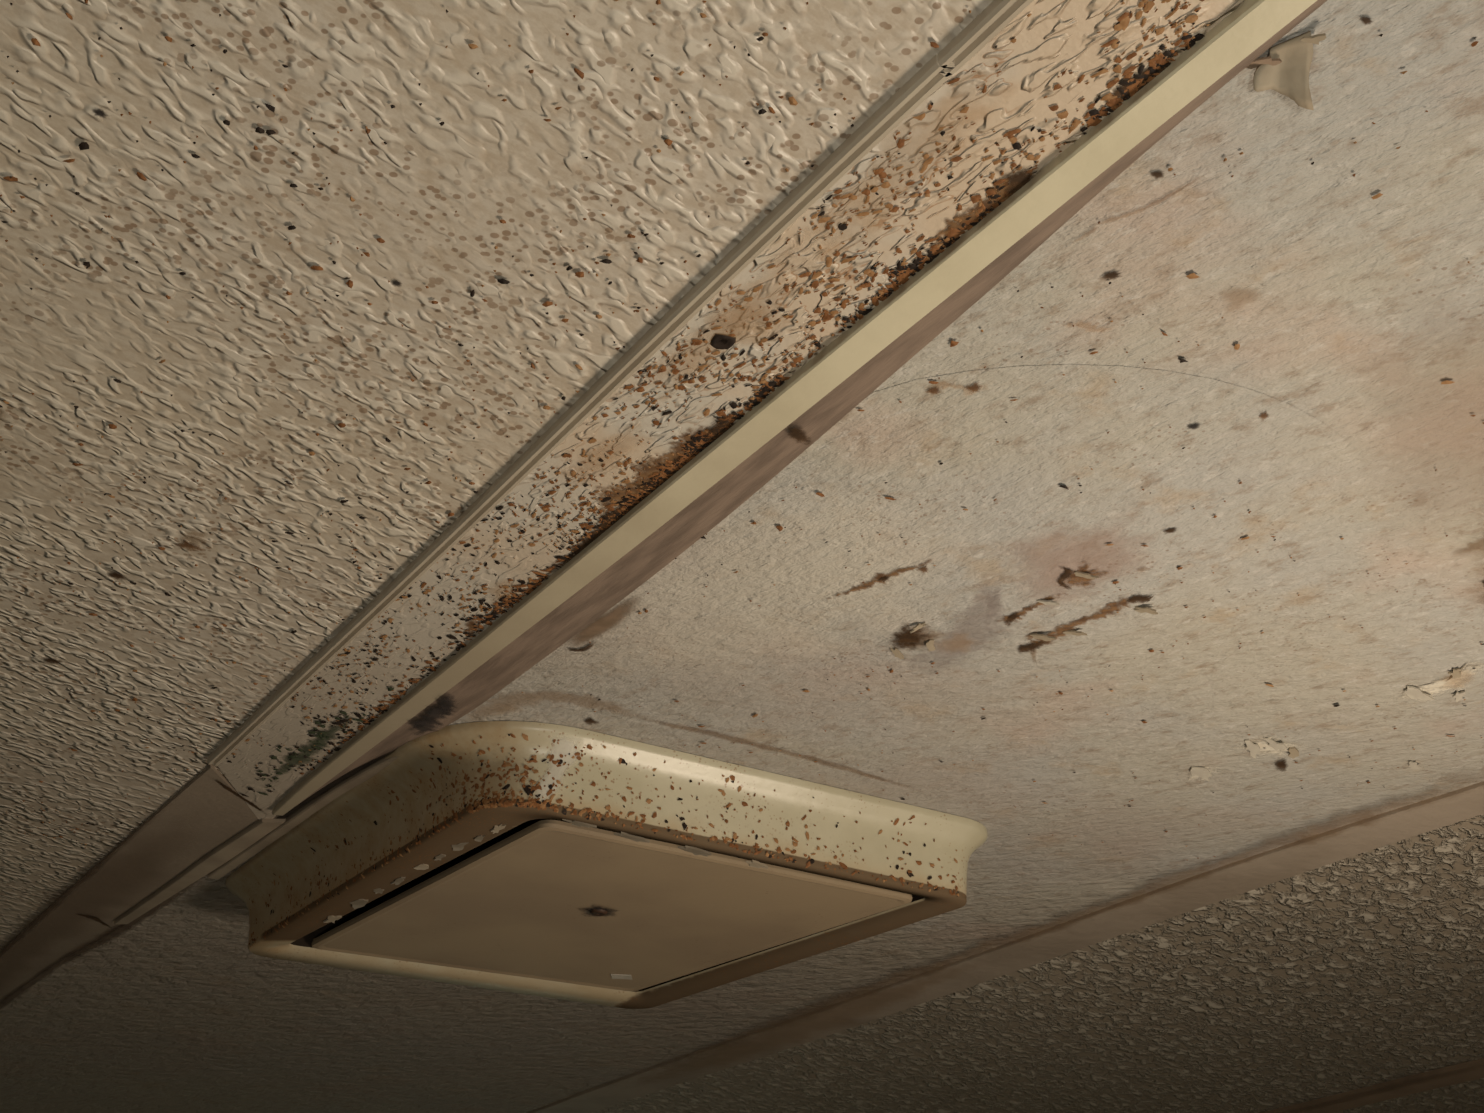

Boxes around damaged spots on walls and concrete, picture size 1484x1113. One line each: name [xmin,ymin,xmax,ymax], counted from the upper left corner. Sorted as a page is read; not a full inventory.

peeling [1246,30,1326,110]
rust [226,0,1210,775]
spalling [1003,562,1108,623]
spalling [1402,665,1484,702]
rust [249,733,959,947]